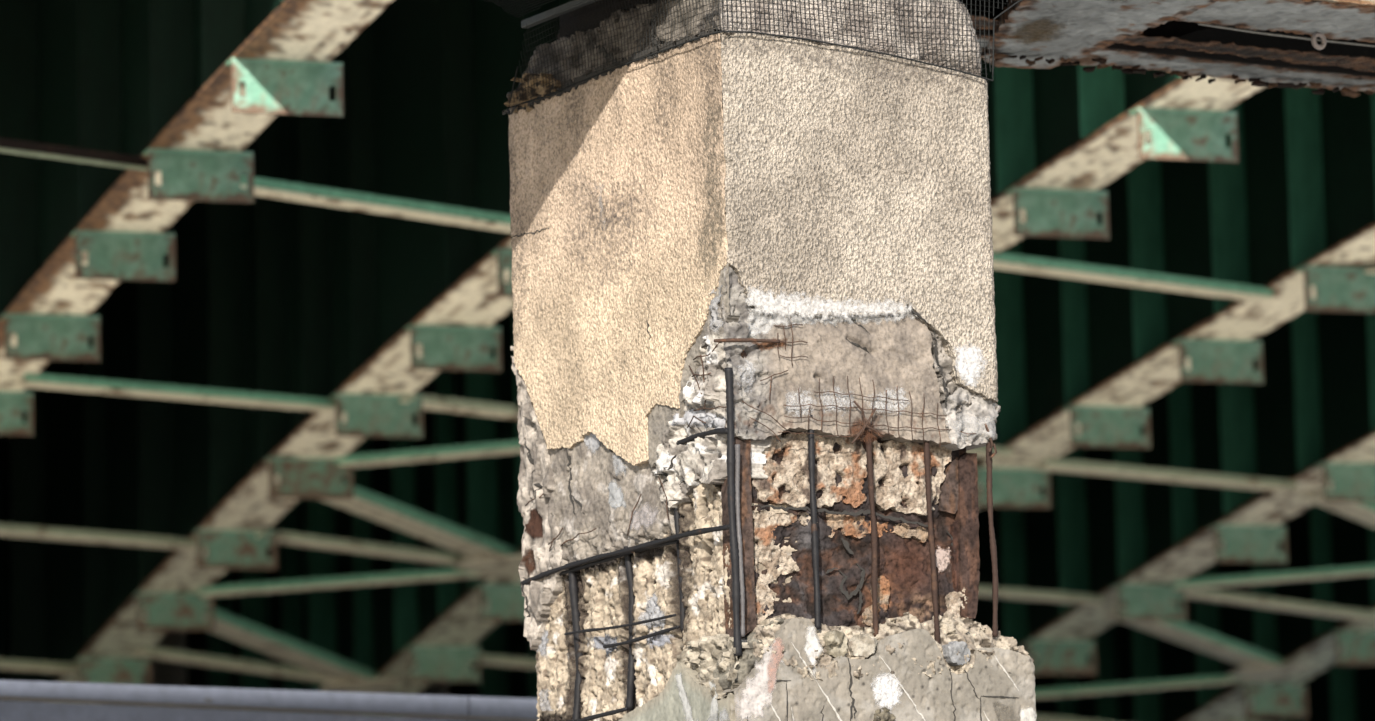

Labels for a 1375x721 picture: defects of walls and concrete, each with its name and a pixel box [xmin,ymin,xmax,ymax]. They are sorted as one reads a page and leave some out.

spalling [510,262,1034,721]
crack [821,658,857,721]
crack [949,669,982,721]